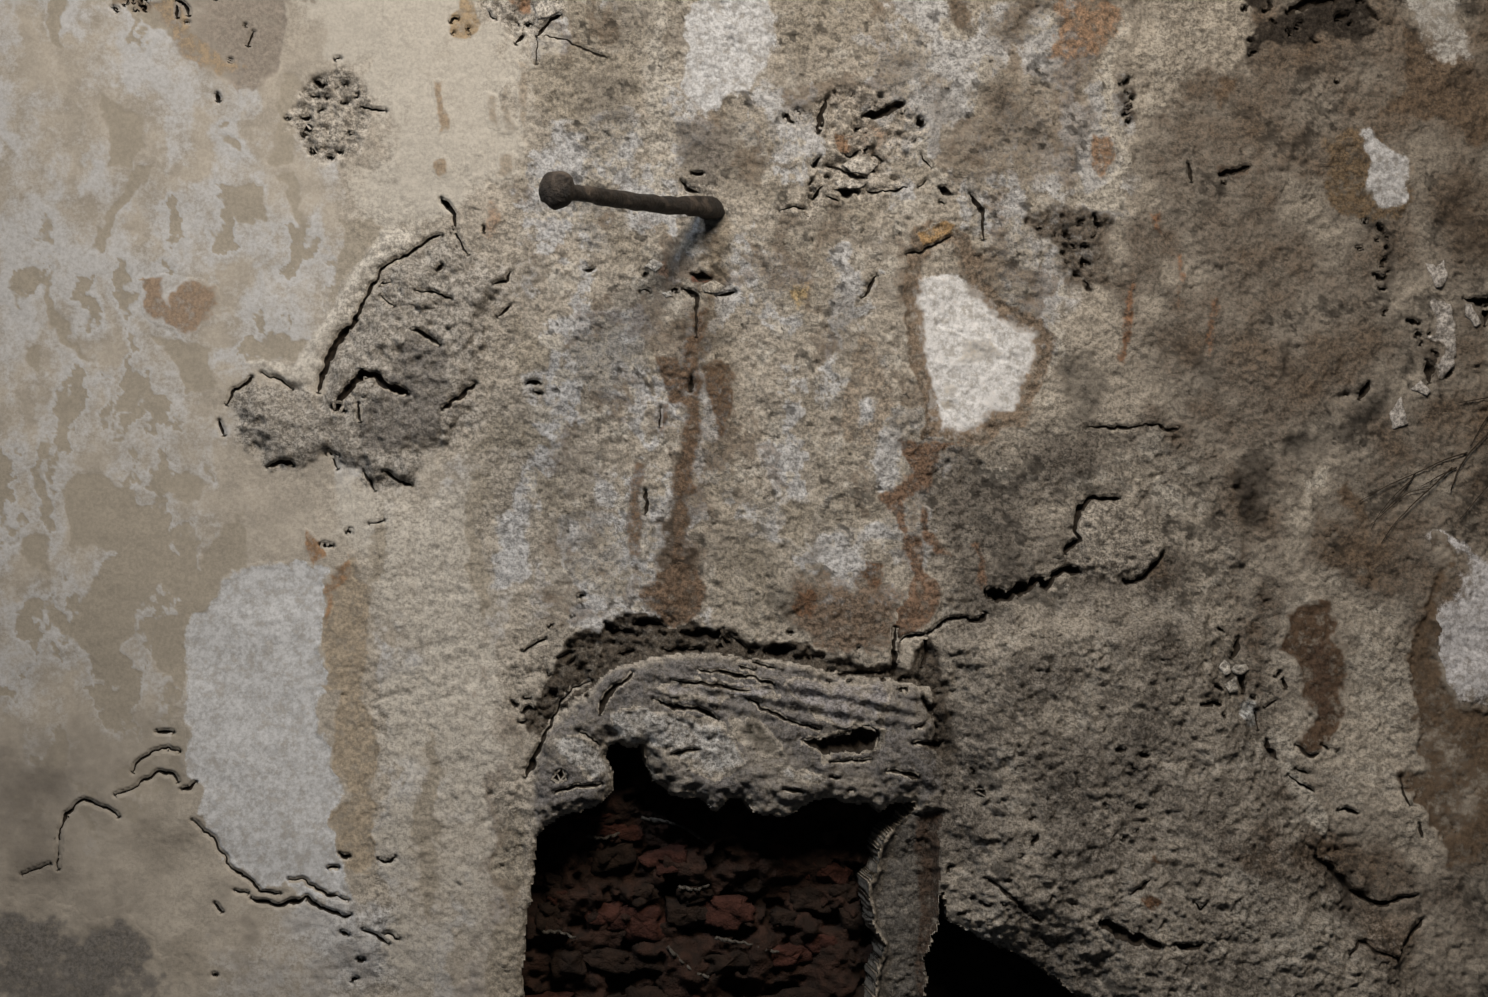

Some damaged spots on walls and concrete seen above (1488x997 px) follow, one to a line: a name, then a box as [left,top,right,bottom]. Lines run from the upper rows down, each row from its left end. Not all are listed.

peeling [98,0,385,172]
leakage [1239,0,1388,70]
rust [474,193,505,244]
peeling [771,75,1059,455]
rust [623,286,741,629]
crack [900,493,1120,643]
crack [1121,551,1166,587]
peeling [179,517,385,904]
spalling [510,592,962,767]
leakage [1392,530,1488,872]
crack [22,728,399,983]
leakage [0,894,184,997]